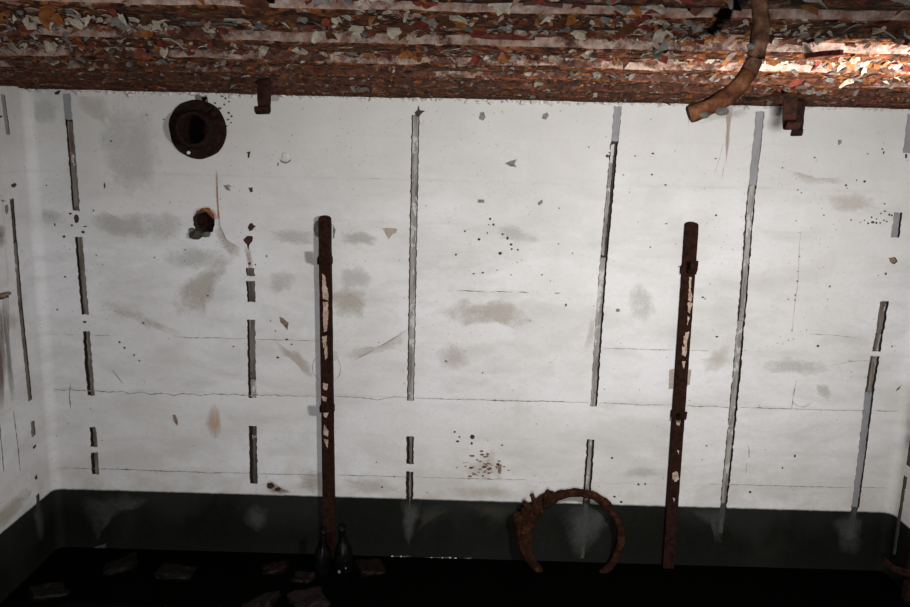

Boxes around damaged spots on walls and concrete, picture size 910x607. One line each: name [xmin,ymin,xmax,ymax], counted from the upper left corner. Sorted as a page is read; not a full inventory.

peeling [0,0,752,127]
peeling [737,0,910,108]